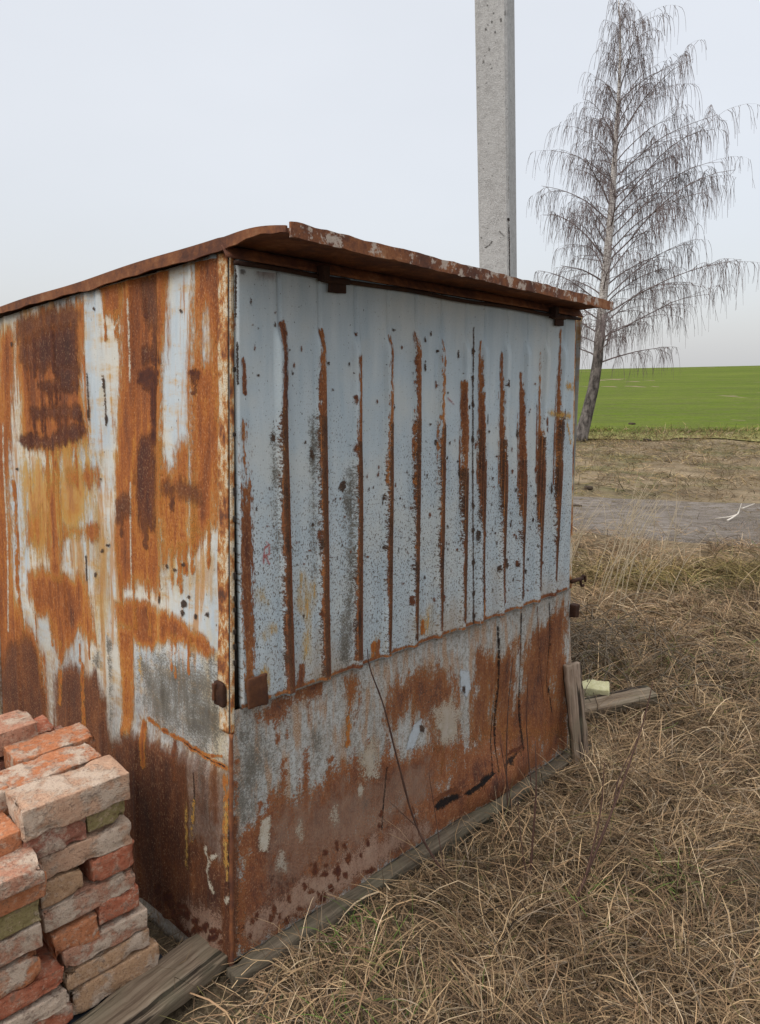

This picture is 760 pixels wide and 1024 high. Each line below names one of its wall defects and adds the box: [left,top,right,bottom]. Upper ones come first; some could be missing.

corrosion [0,258,574,965]